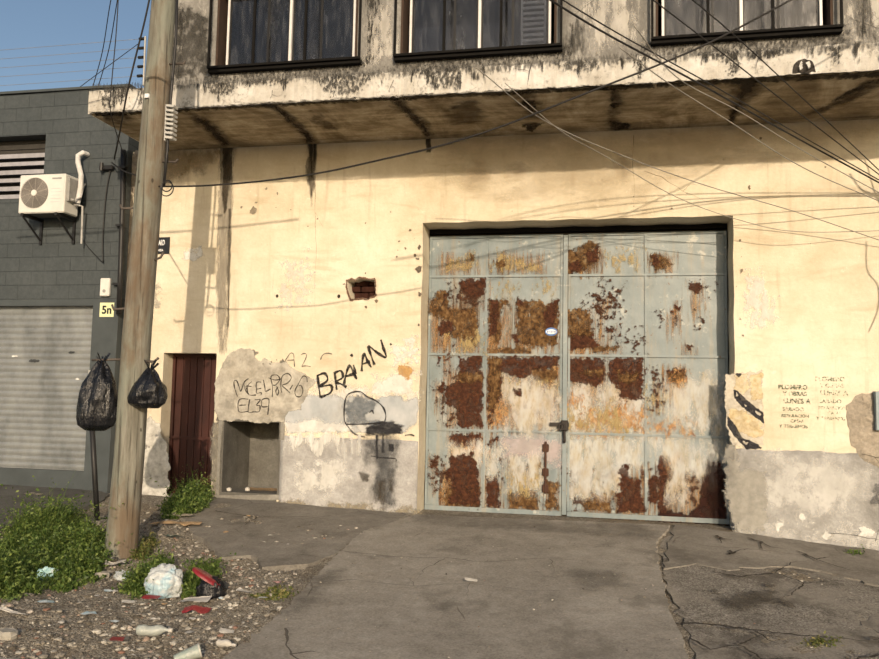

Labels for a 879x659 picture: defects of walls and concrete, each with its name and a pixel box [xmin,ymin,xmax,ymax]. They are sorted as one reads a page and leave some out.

damp [172,0,879,351]
spalling [337,272,378,308]
peeling [214,348,376,433]
corrosion [427,240,727,524]
peeling [723,445,768,534]
crack [712,535,866,601]
crack [681,622,879,659]